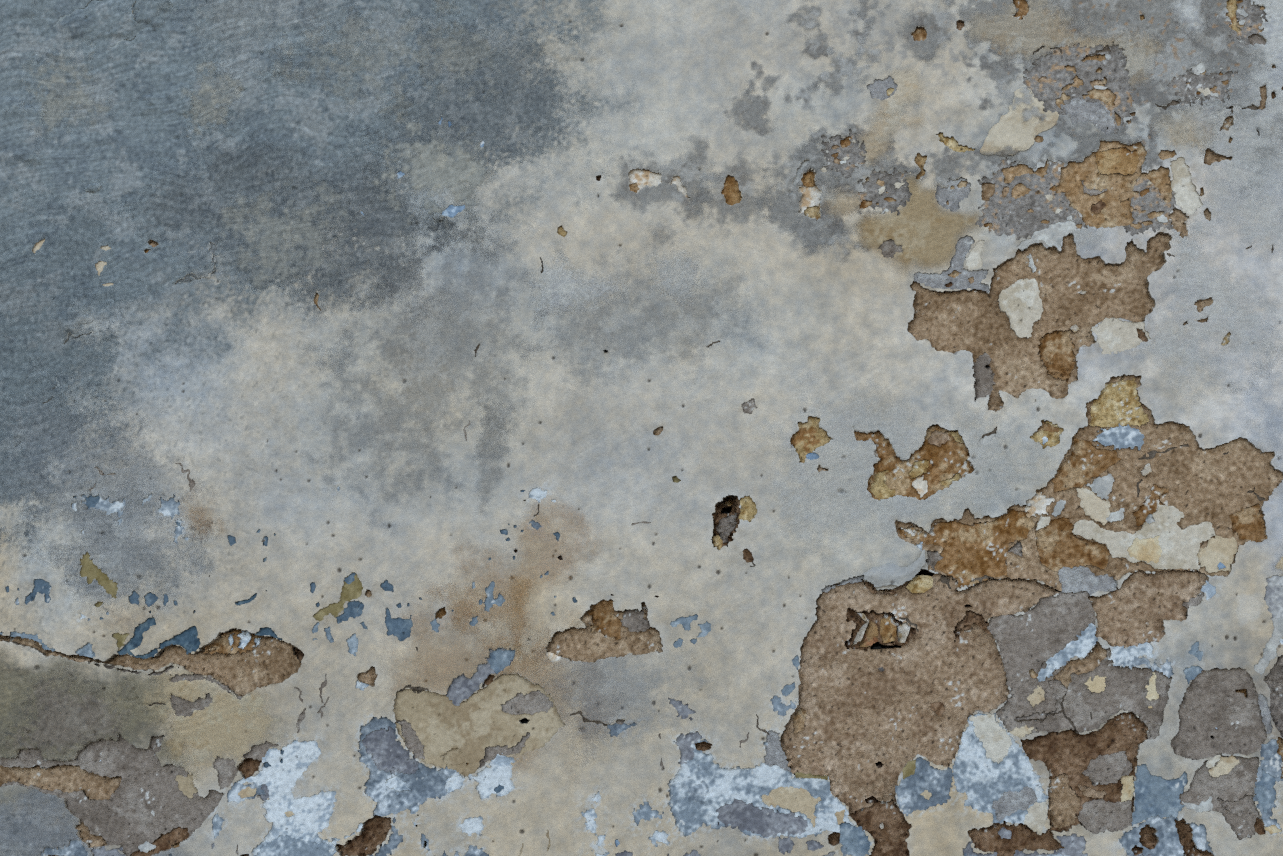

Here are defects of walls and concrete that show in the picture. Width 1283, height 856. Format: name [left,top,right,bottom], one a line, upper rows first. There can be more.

flaking render [867,76,898,101]
water stain [375,117,486,213]
flaking render [793,129,927,221]
water stain [224,183,345,287]
flaking render [907,43,1238,412]
peeling [71,494,126,525]
peeling [500,520,563,578]
flaking render [0,552,422,717]
peeling [430,608,454,632]
flaking render [545,596,711,663]
flaking render [0,648,566,856]
peeling [581,791,633,856]